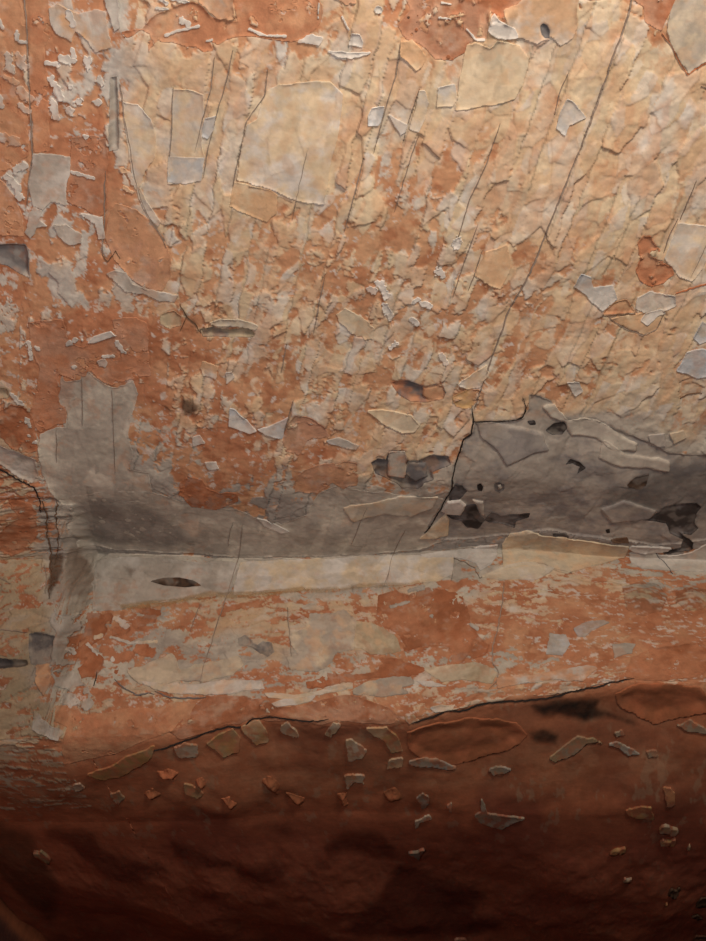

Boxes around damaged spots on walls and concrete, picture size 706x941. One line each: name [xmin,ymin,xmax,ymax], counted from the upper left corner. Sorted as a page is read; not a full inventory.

peeling [0,0,371,337]
crack [195,51,233,177]
crack [233,69,268,185]
crack [344,48,400,232]
peeling [368,0,593,136]
peeling [634,0,706,73]
peeling [366,279,394,321]
crack [384,0,632,585]
peeling [574,223,706,335]
crack [0,469,60,598]
spalling [0,317,706,777]
crack [153,716,328,752]